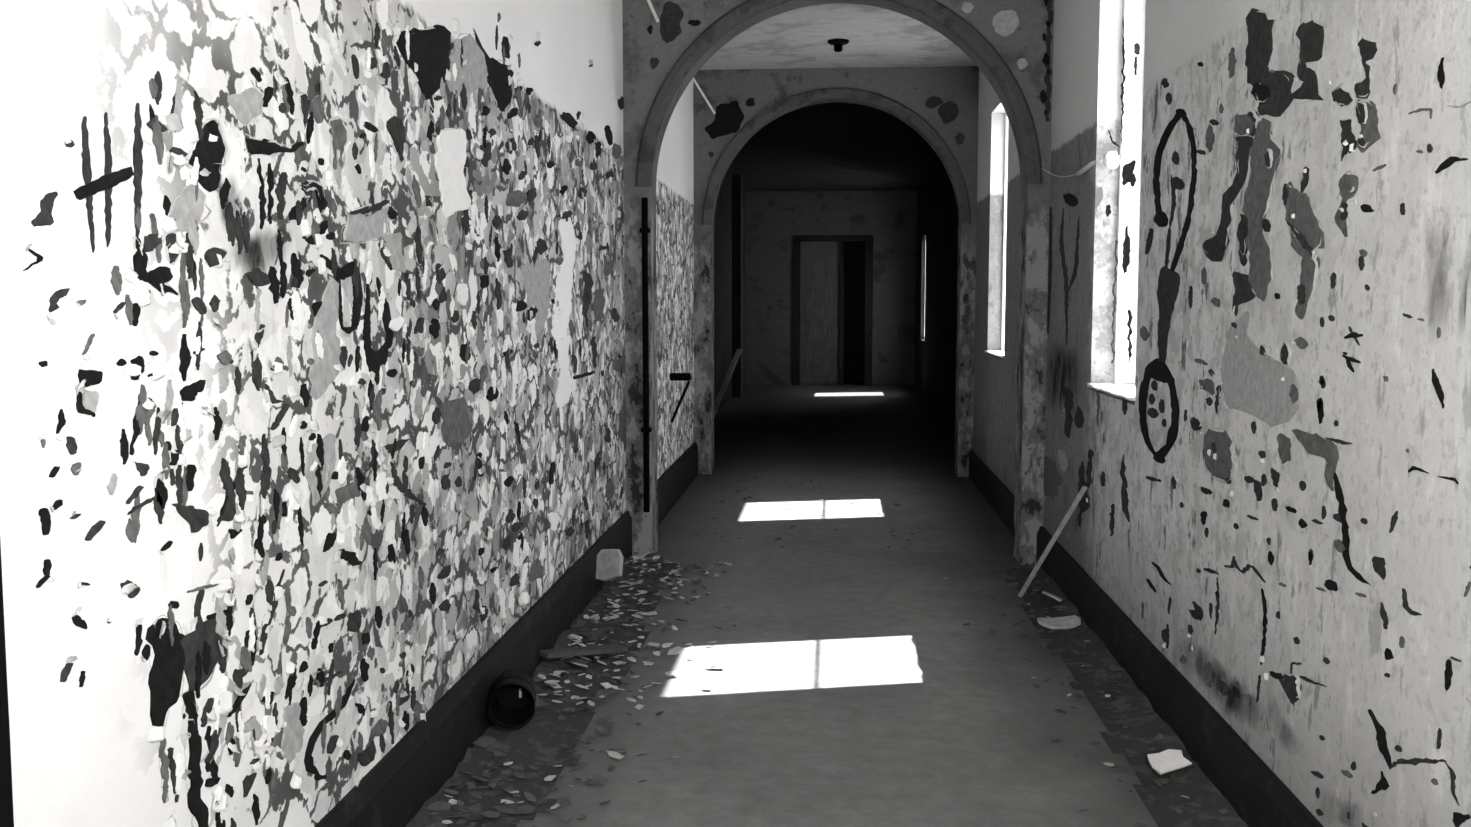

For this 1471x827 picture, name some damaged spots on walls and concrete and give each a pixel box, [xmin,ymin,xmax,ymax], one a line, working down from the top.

flaking render [632,0,724,76]
flaking render [705,98,755,157]
peeling [22,191,58,271]
flaking render [36,12,626,827]
crack [1408,466,1459,484]
crack [1291,429,1422,629]
peeling [1316,579,1367,597]
flaking render [1372,556,1386,580]
crack [1463,566,1471,597]
peeling [1383,617,1405,678]
crack [1444,656,1461,691]
crack [1368,709,1471,827]